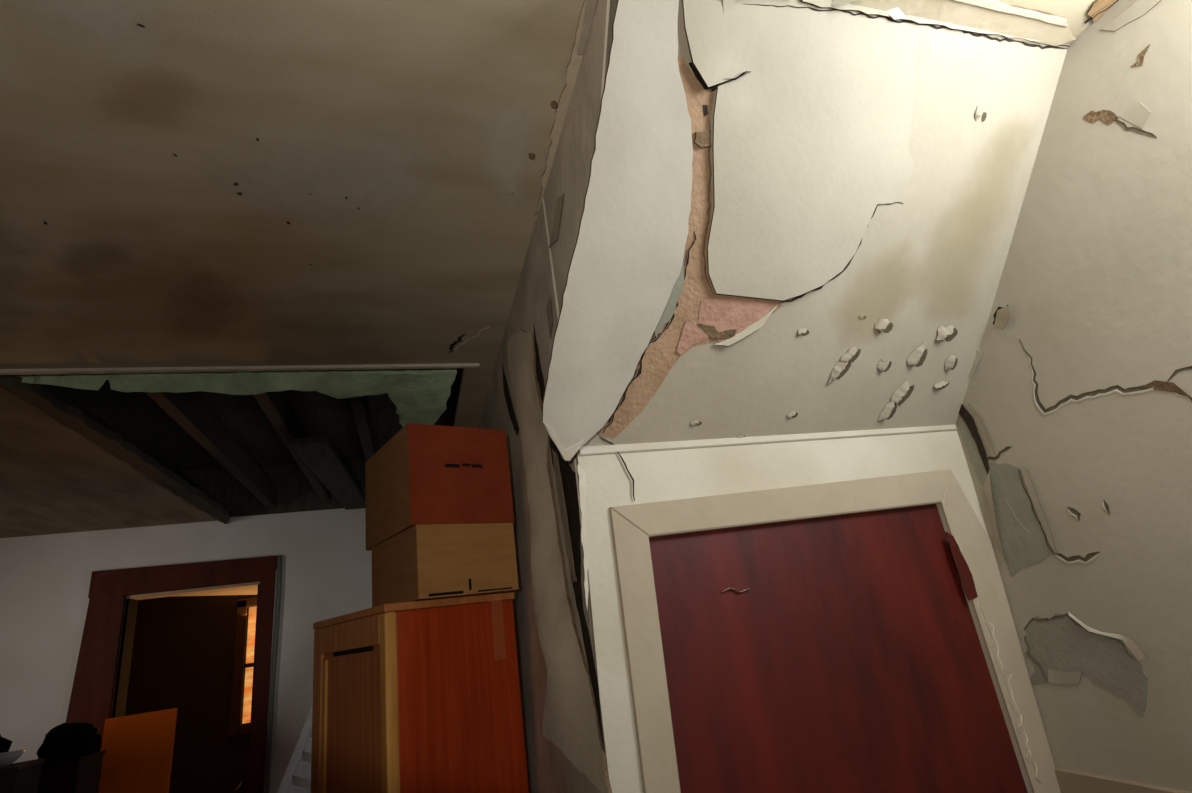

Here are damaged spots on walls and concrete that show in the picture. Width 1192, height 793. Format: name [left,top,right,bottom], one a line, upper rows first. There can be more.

crack [749,4,1068,49]
peeling [542,0,1076,461]
crack [1019,339,1192,416]
spalling [0,375,230,524]
spalling [983,461,1057,577]
crack [1054,552,1101,565]
crack [1067,500,1110,521]
spalling [1024,611,1148,718]